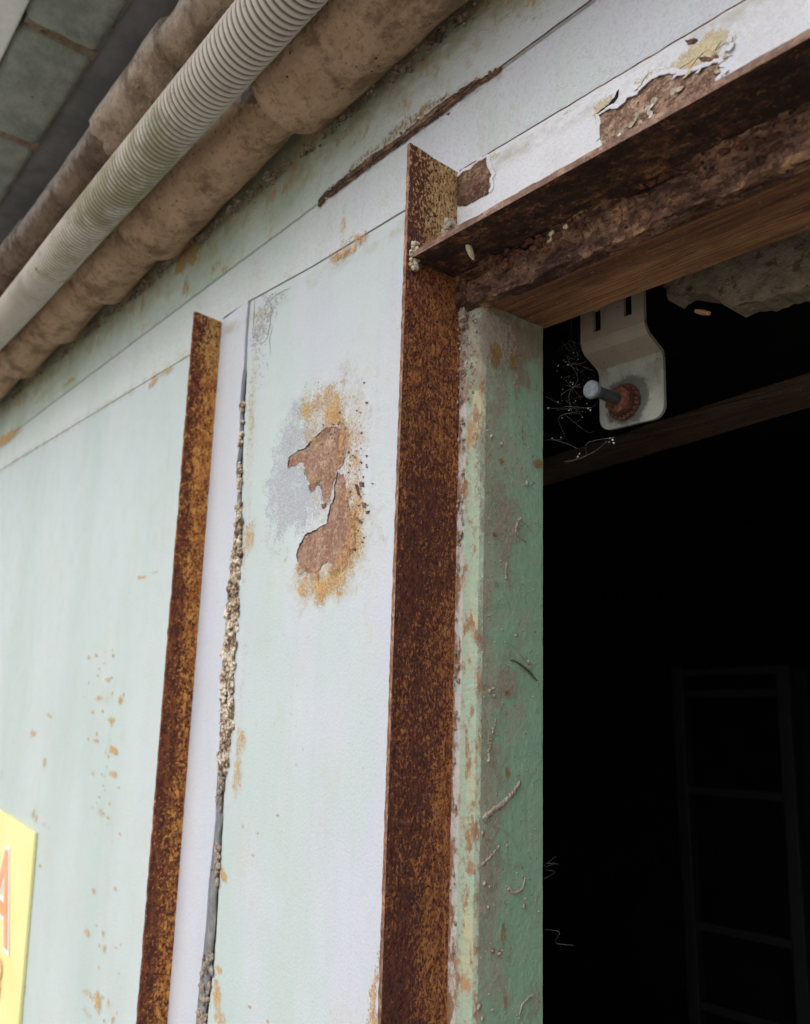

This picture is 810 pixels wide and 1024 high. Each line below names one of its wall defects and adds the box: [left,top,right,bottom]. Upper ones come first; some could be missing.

peeling [317,64,501,208]
corrosion [318,67,502,207]
corrosion [457,0,746,206]
peeling [594,29,736,147]
peeling [265,380,373,606]